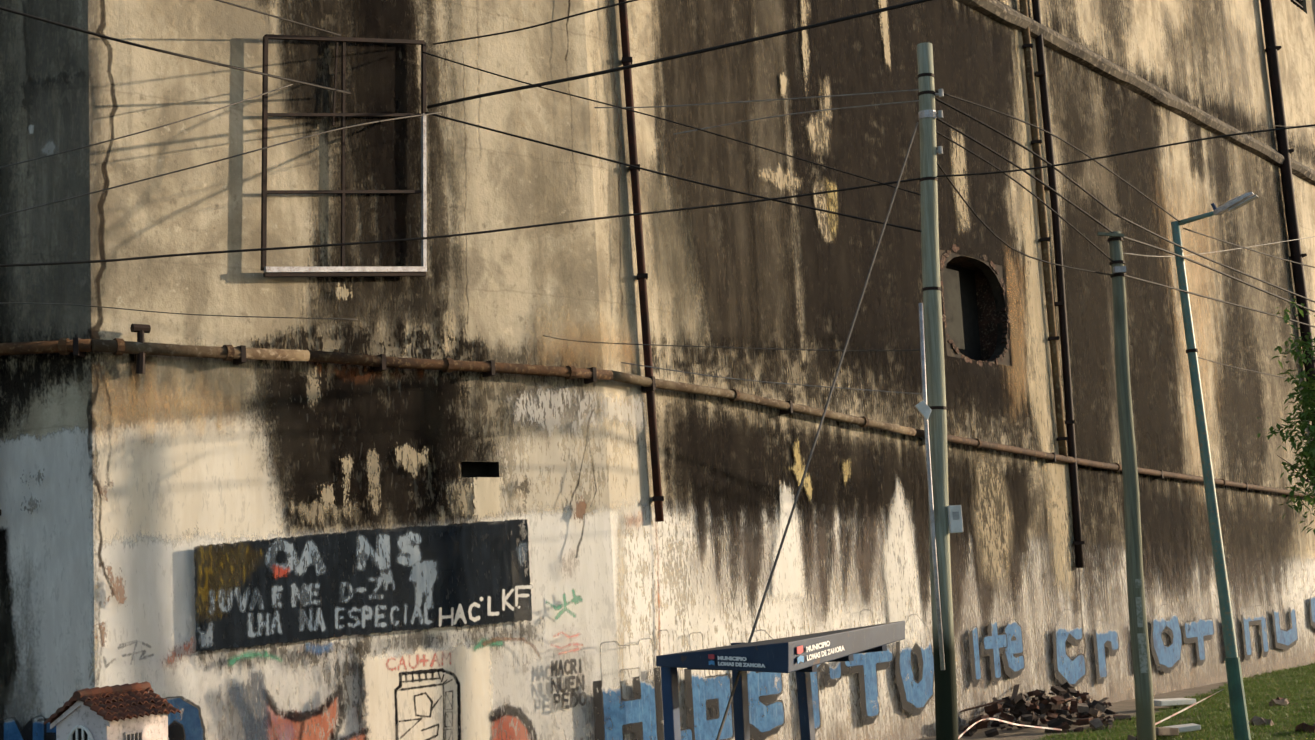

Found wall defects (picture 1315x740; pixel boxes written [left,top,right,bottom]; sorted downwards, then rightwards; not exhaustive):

leakage [0,0,176,437]
crack [87,0,118,595]
leakage [196,0,603,536]
leakage [652,0,1315,740]